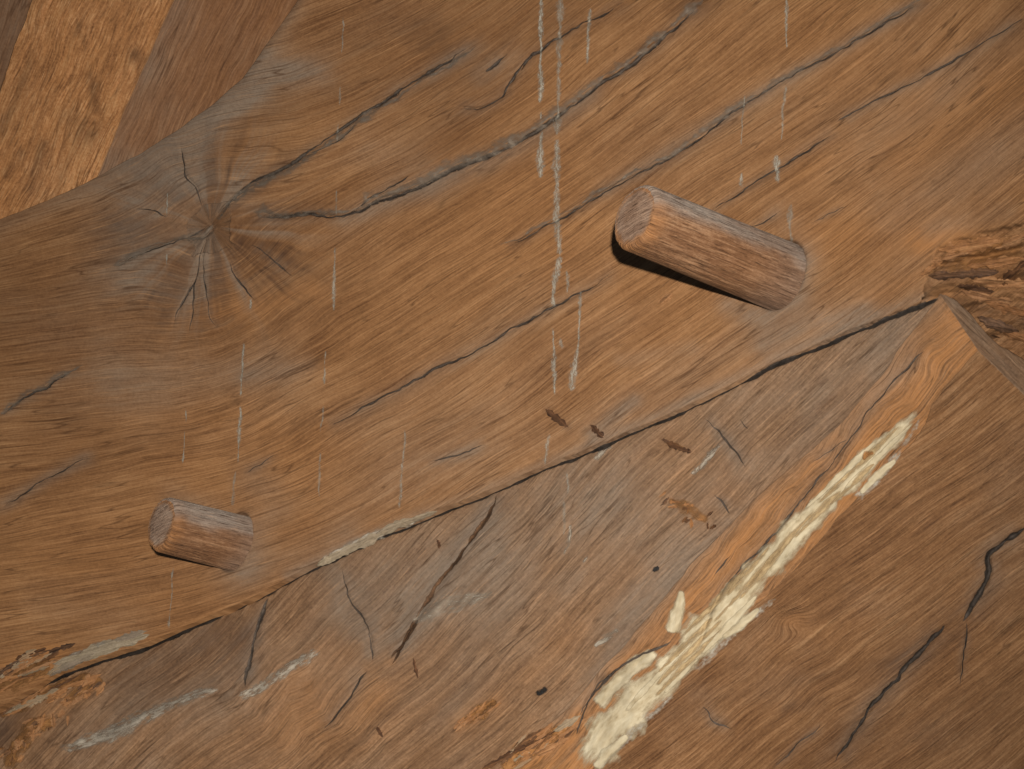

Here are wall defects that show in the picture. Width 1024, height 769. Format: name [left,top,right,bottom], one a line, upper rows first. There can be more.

crack [244,600,267,684]
crack [116,7,693,325]
crack [325,498,496,728]
crack [435,446,479,461]
crack [334,283,599,424]
leakage [537,136,560,304]
peeling [482,414,913,769]
crack [509,6,909,242]
crack [707,354,920,614]
crack [718,19,1022,206]
crack [836,528,1024,759]
peeling [928,234,1024,342]